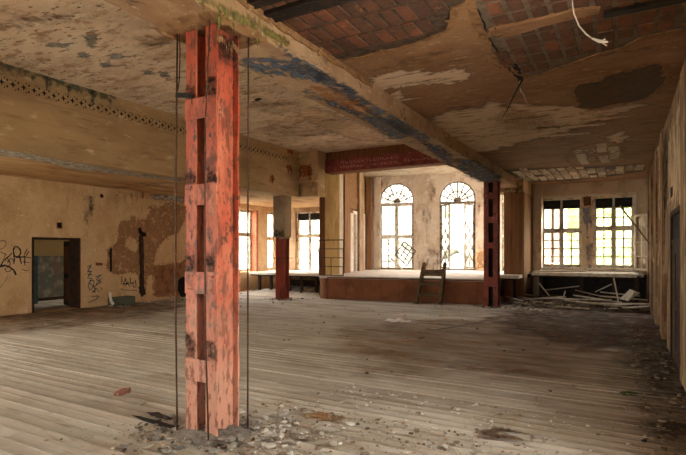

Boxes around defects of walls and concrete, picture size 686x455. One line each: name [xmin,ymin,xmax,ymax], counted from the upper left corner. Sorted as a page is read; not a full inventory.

flaking render [237,0,686,88]
crack [477,8,533,117]
peeling [240,45,673,271]
flaking render [104,194,186,308]